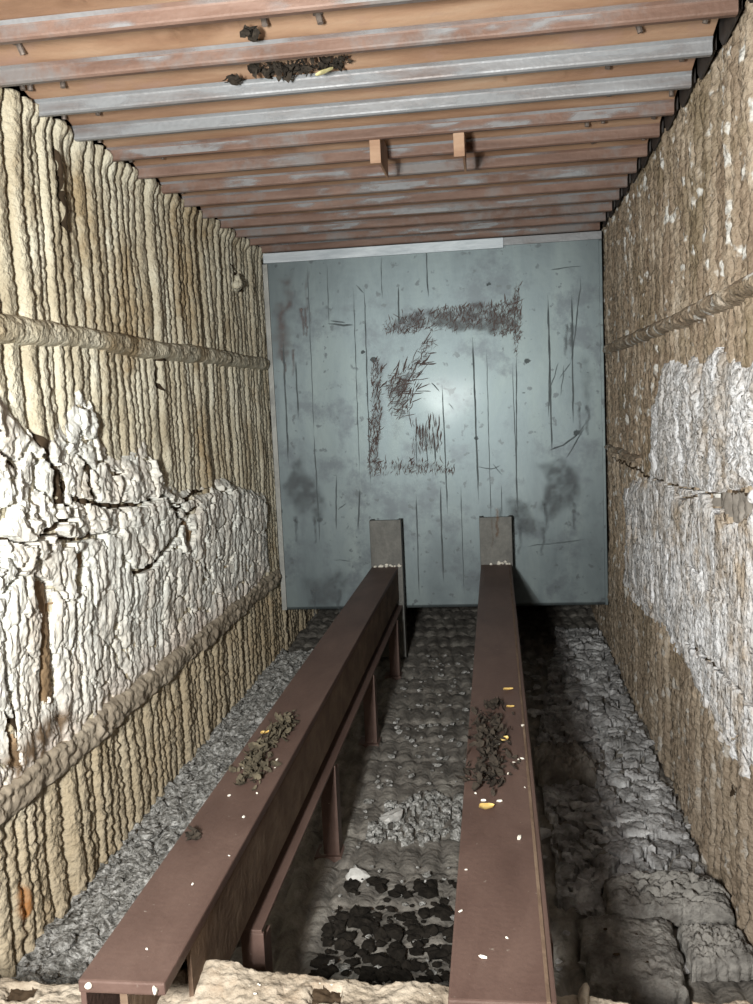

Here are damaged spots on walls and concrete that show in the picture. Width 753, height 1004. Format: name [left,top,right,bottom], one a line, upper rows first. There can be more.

crack [0,432,209,574]
crack [612,457,748,499]
damp [7,708,71,776]